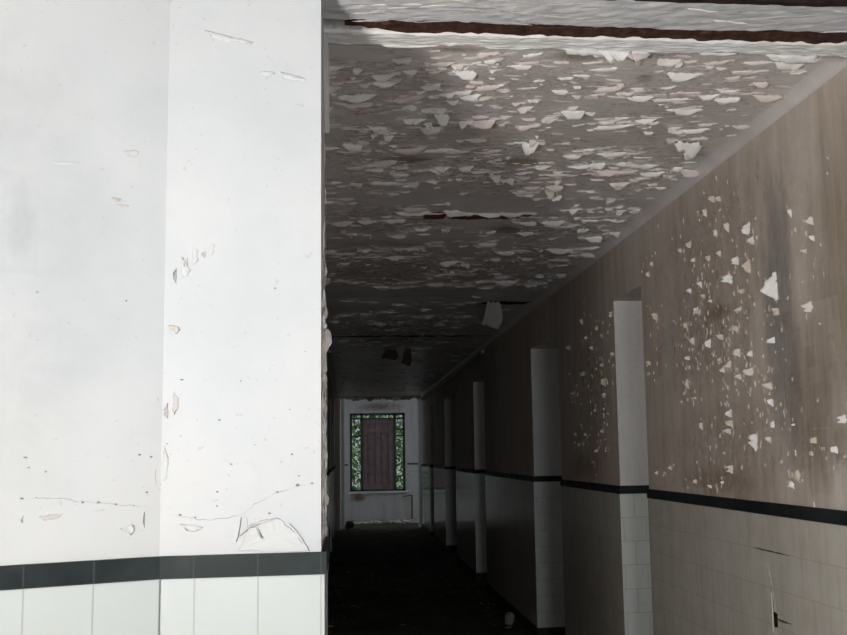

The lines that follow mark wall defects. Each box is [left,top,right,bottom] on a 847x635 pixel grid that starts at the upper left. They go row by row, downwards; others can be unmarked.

peeling [350,0,595,25]
peeling [679,8,847,25]
peeling [322,34,825,540]
peeling [809,436,847,469]
crack [20,497,148,508]
crack [170,482,313,527]
crack [756,548,790,635]